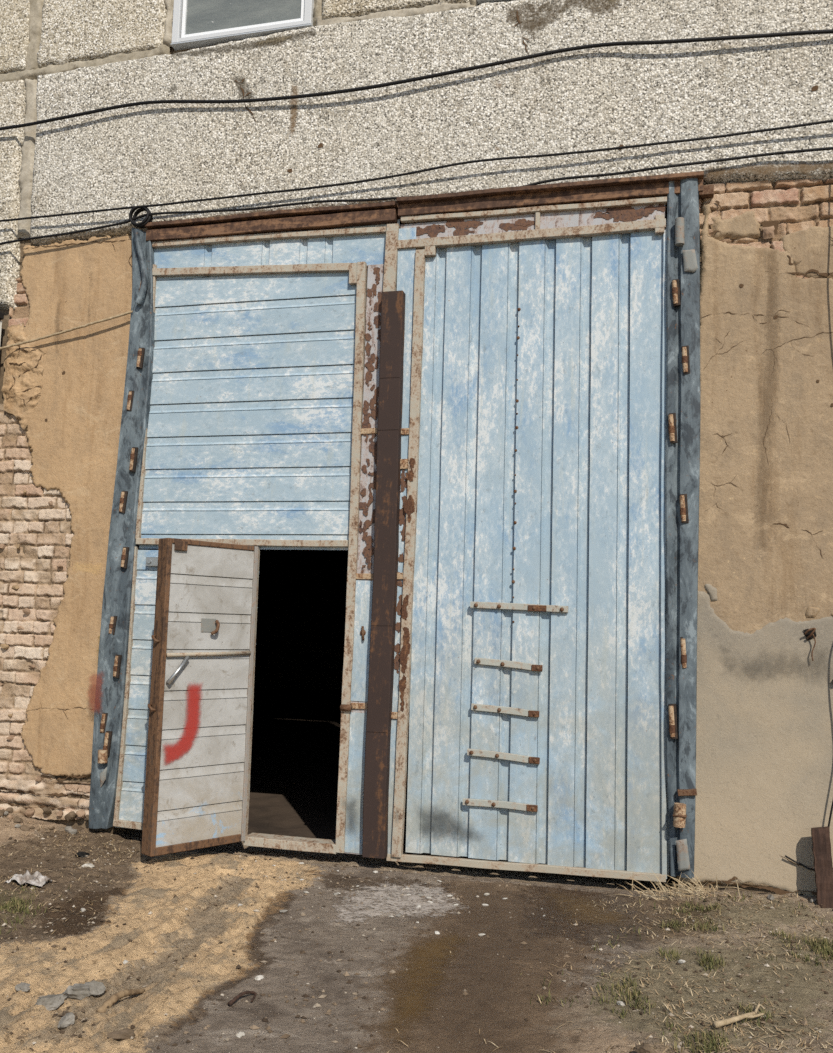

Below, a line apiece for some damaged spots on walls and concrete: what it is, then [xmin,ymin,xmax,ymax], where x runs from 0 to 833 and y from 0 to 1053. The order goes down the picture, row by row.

leakage [508,0,617,38]
spalling [699,178,833,279]
spalling [8,277,30,327]
crack [701,310,831,372]
corrosion [404,495,415,523]
corrosion [406,458,415,481]
crack [705,433,743,511]
spalling [0,404,91,821]
corrosion [399,594,411,711]
peeling [679,584,833,896]